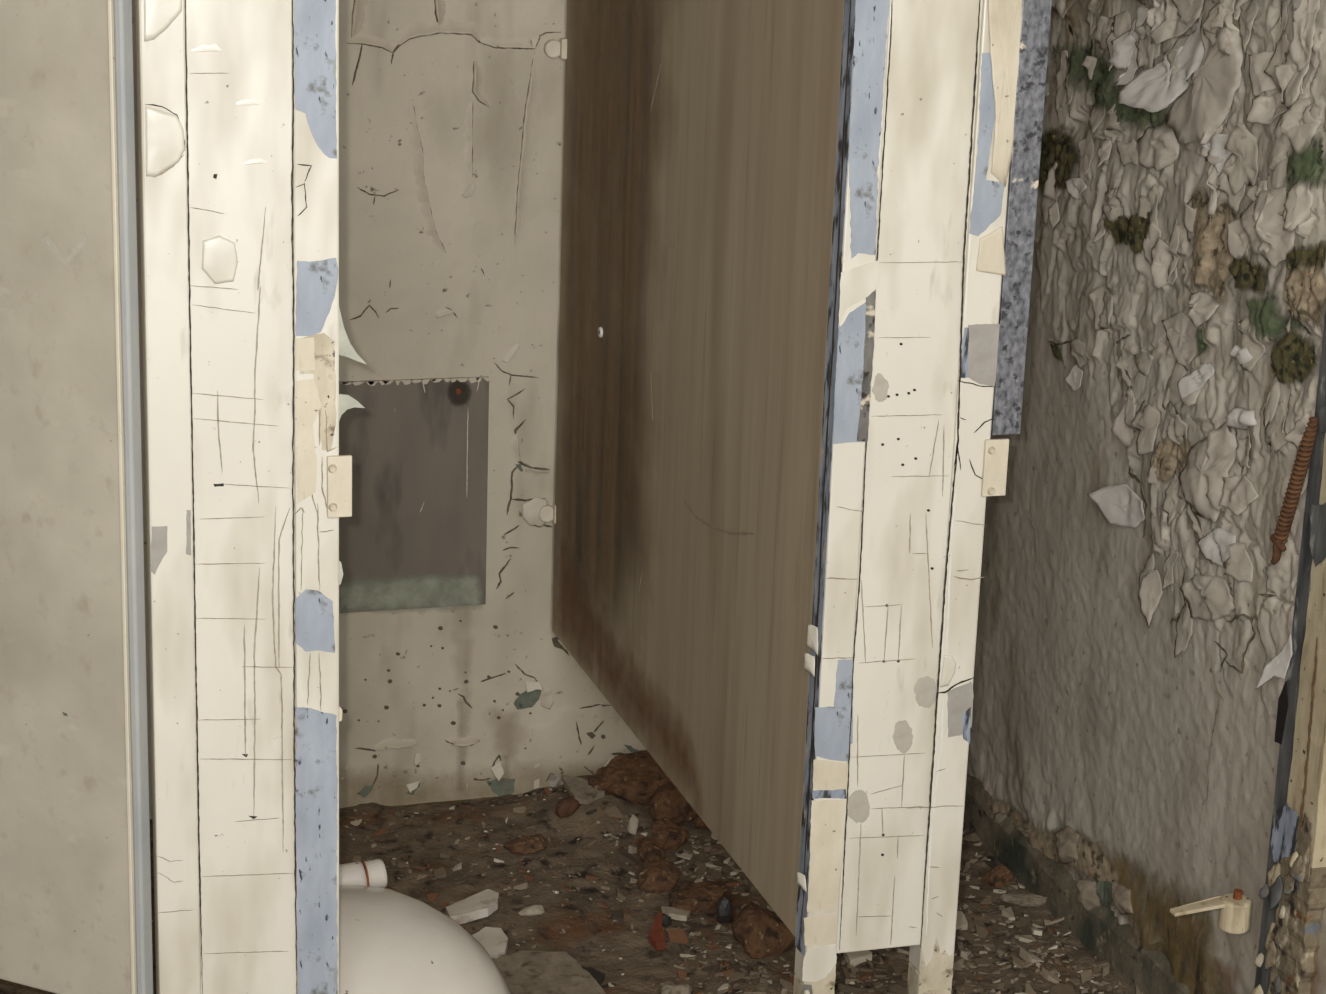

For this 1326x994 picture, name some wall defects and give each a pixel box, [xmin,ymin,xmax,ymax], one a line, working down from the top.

peeling [294,0,337,159]
crack [346,0,560,228]
peeling [969,0,1023,276]
water stain [1062,46,1167,126]
peeling [1043,0,1326,339]
peeling [295,258,366,504]
crack [350,279,398,320]
crack [495,363,552,599]
peeling [1087,312,1214,528]
peeling [1138,528,1254,658]
peeling [1255,633,1293,689]
peeling [295,706,342,994]